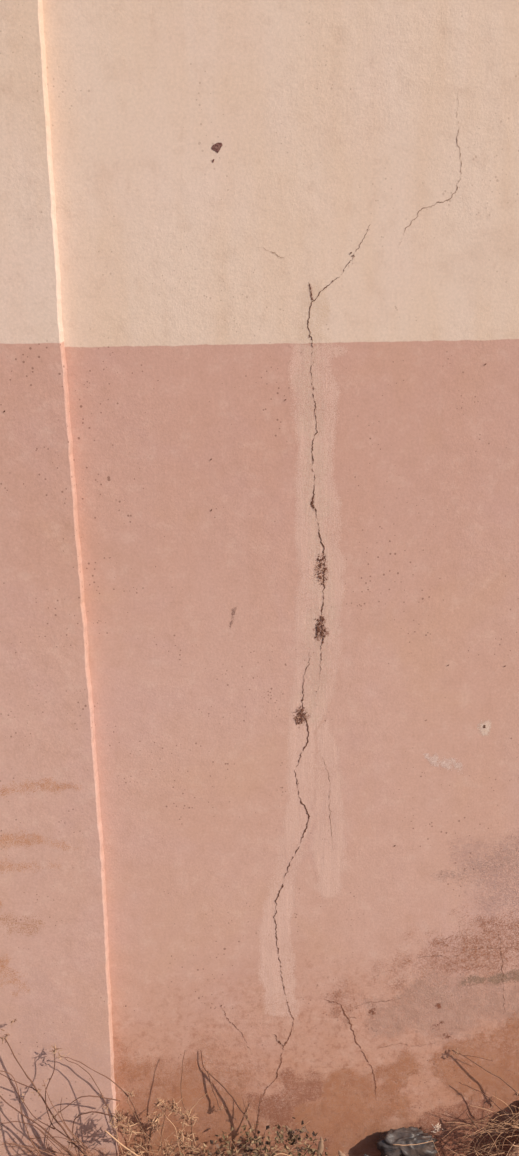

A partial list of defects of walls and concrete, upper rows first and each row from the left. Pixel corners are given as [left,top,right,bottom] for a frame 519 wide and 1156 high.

crack [257,225,370,1136]
crack [324,994,433,1095]